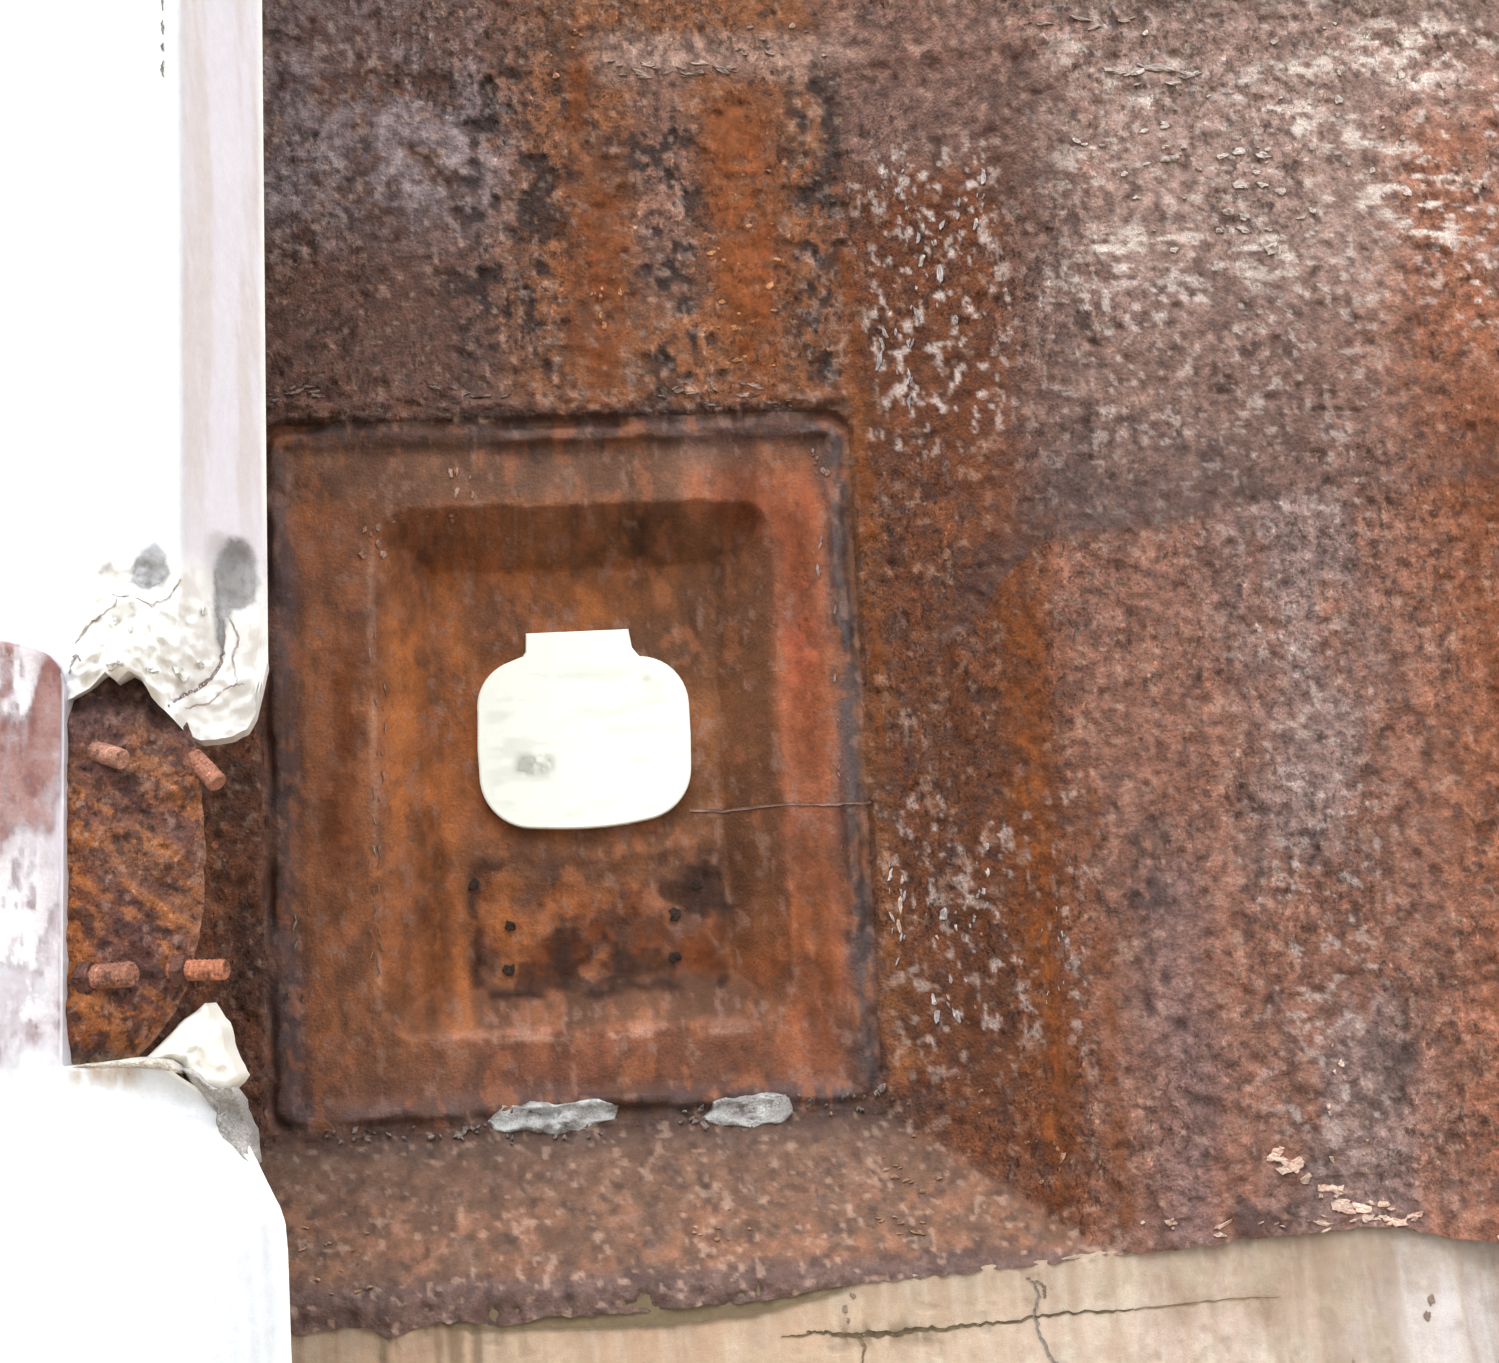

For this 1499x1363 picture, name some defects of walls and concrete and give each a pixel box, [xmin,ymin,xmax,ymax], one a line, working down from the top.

spalling [147,540,258,709]
rust [474,861,728,997]
crack [781,1277,1278,1363]